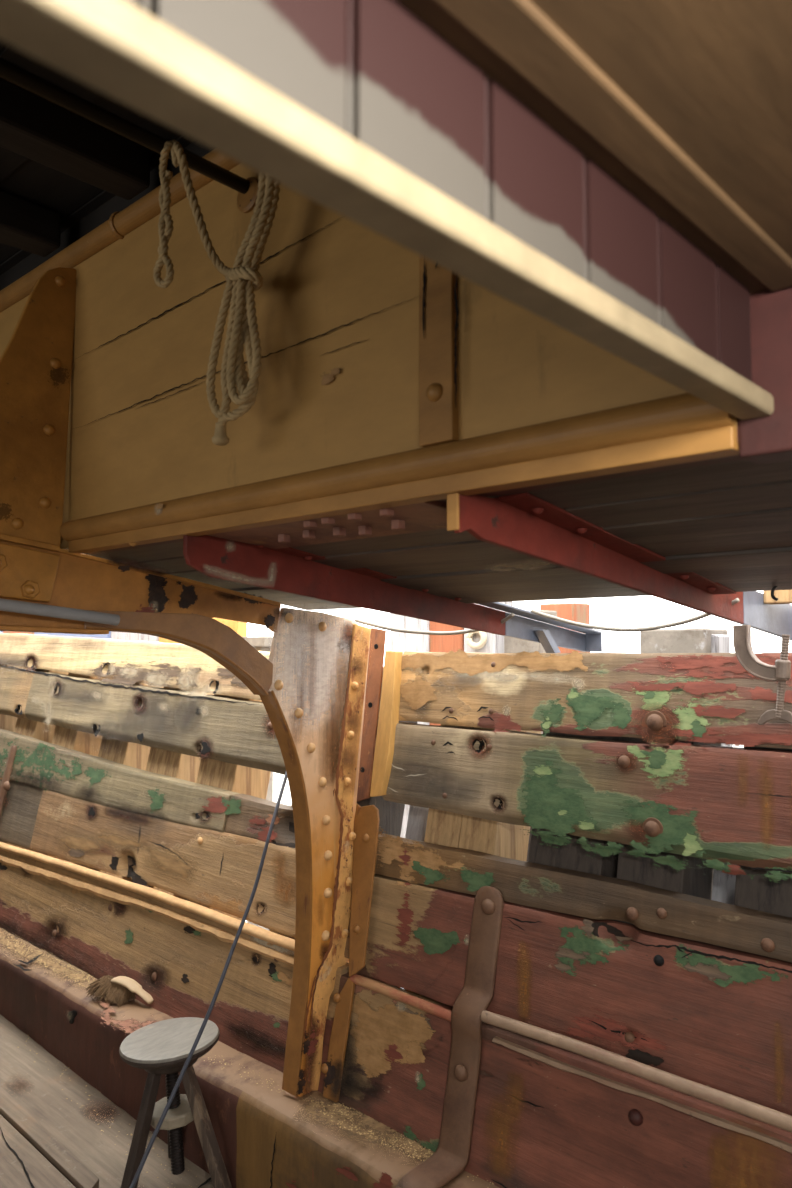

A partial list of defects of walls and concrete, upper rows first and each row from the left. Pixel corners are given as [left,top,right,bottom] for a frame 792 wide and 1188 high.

crack [260,217,342,264]
crack [73,257,459,429]
peeling [400,649,588,710]
peeling [493,714,521,734]
peeling [539,653,792,781]
peeling [519,761,792,883]
peeling [554,925,630,976]
peeling [674,942,789,987]
peeling [350,985,436,1091]
crack [0,1128,35,1188]